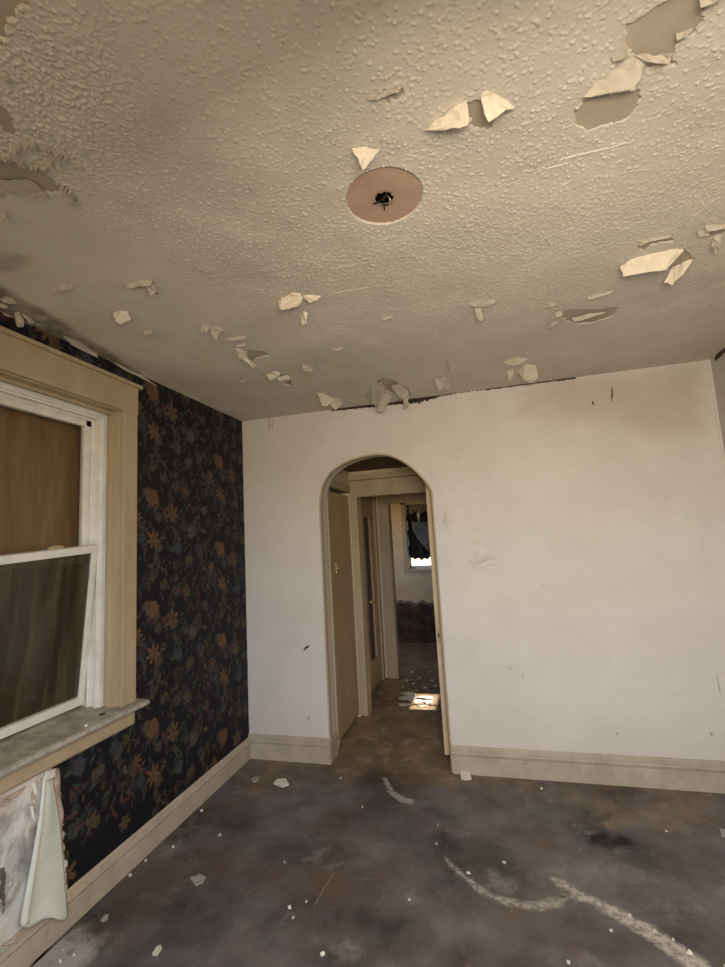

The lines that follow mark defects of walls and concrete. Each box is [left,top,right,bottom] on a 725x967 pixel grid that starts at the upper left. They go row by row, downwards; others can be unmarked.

peeling [0,0,28,46]
peeling [574,0,718,131]
peeling [424,90,515,131]
peeling [0,101,77,206]
peeling [620,235,694,285]
peeling [0,294,34,327]
peeling [113,311,131,324]
peeling [541,290,619,328]
peeling [57,330,156,386]
peeling [198,325,269,369]
peeling [504,357,538,384]
flaking render [0,769,61,946]